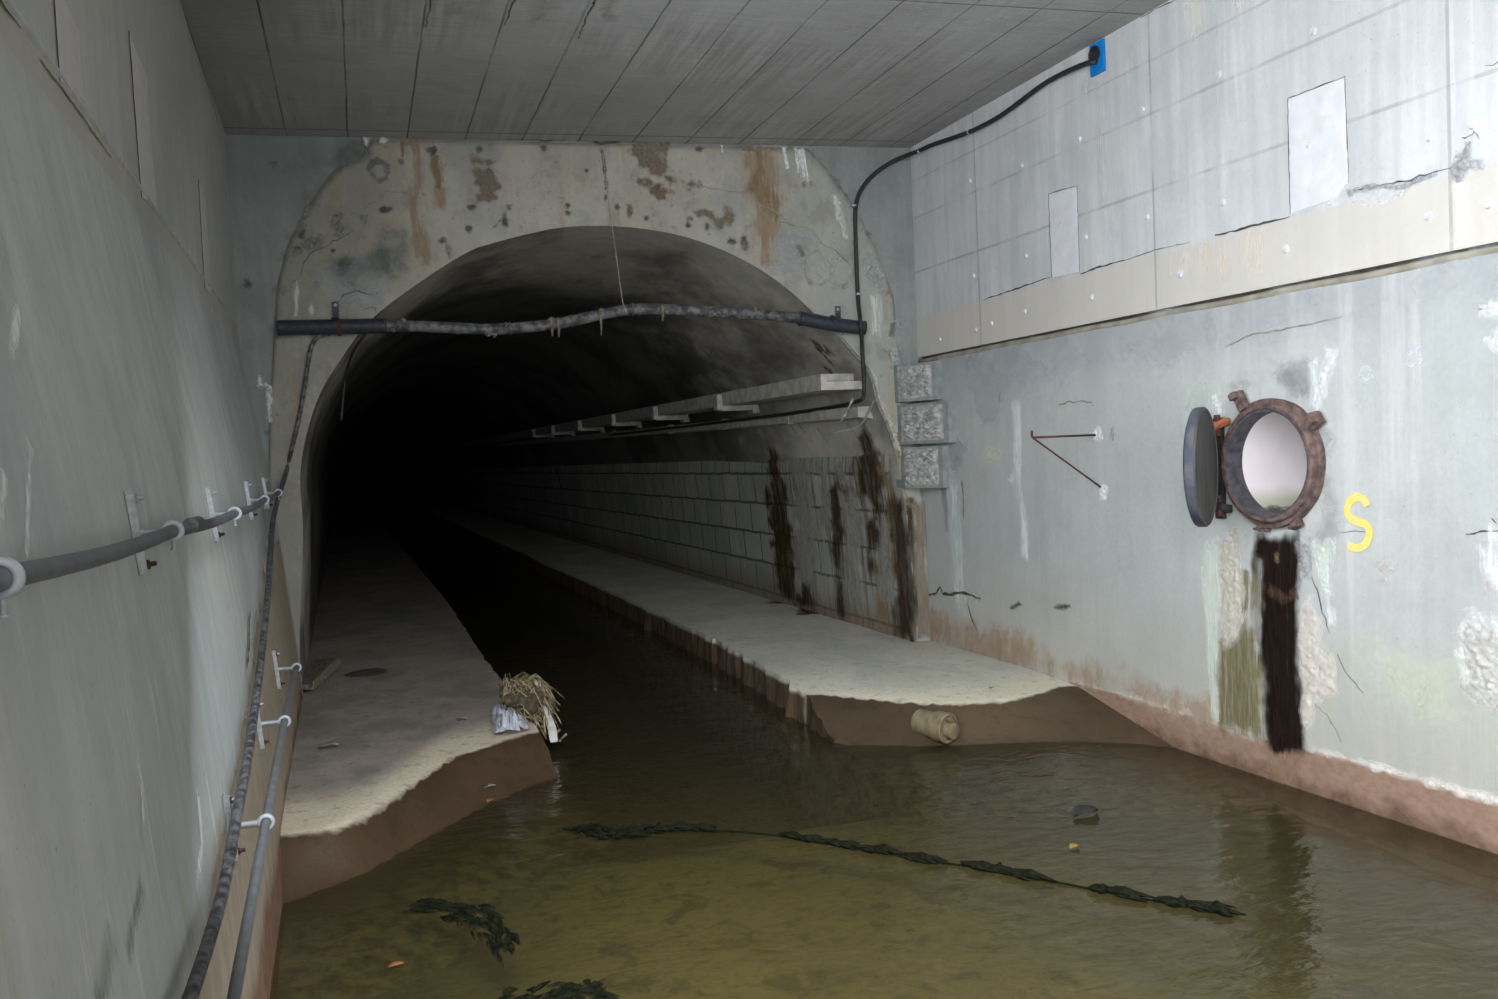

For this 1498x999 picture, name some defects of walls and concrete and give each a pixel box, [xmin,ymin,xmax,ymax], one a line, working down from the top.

corrosion [401,139,450,264]
corrosion [743,146,779,264]
water stain [1279,352,1334,409]
water stain [1318,427,1331,452]
water stain [765,428,929,642]
water stain [942,440,964,601]
peeling [1218,531,1245,645]
water stain [1070,474,1498,879]
spalling [1458,616,1498,708]